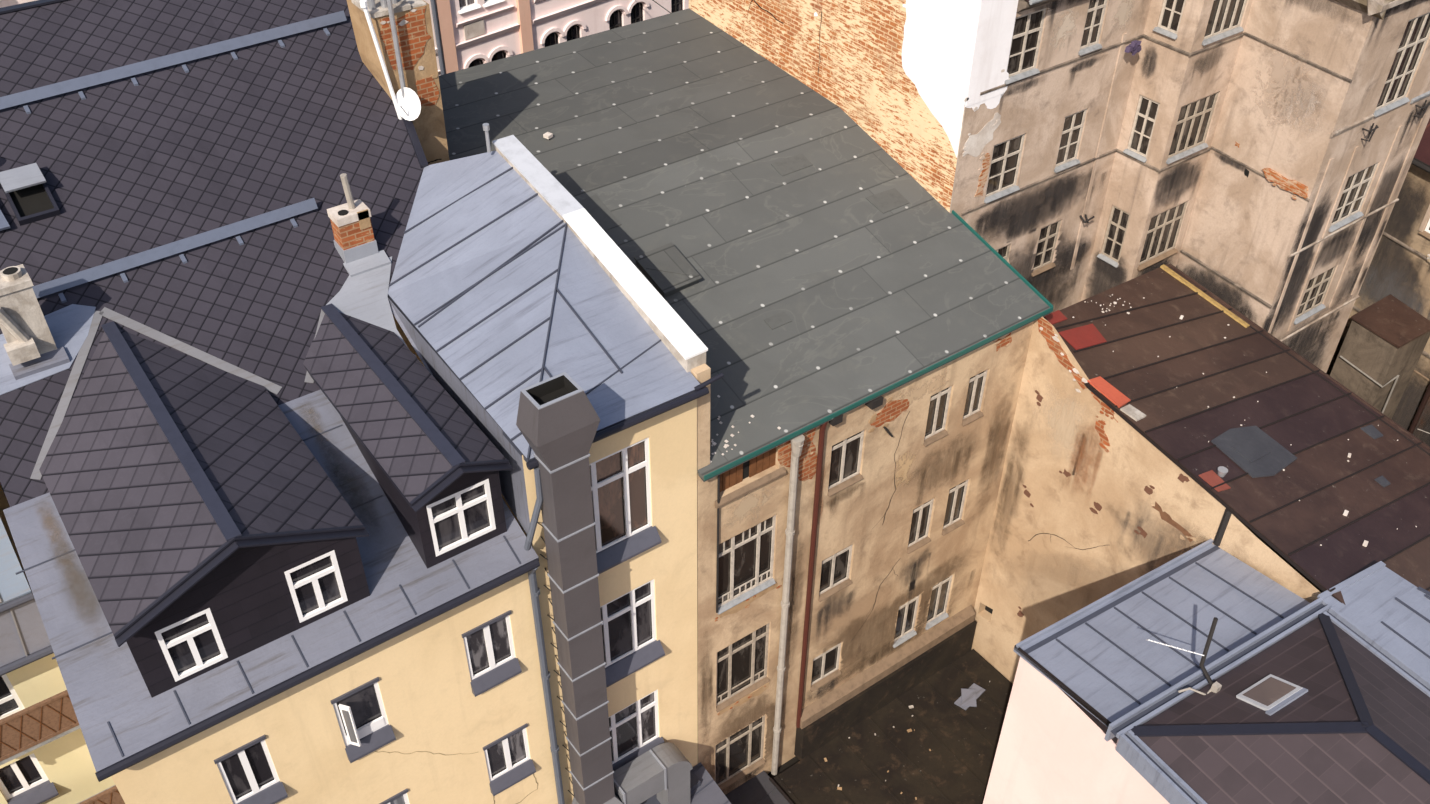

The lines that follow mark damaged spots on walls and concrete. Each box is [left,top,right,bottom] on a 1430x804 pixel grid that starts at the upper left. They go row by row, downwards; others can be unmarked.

spalling [810,0,823,17]
peeling [963,69,1010,197]
flaking render [1244,168,1308,199]
spalling [869,398,909,433]
flaking render [1037,318,1118,453]
flaking render [778,428,817,481]
crack [876,411,910,525]
spalling [1144,485,1196,549]
water stain [838,570,949,668]